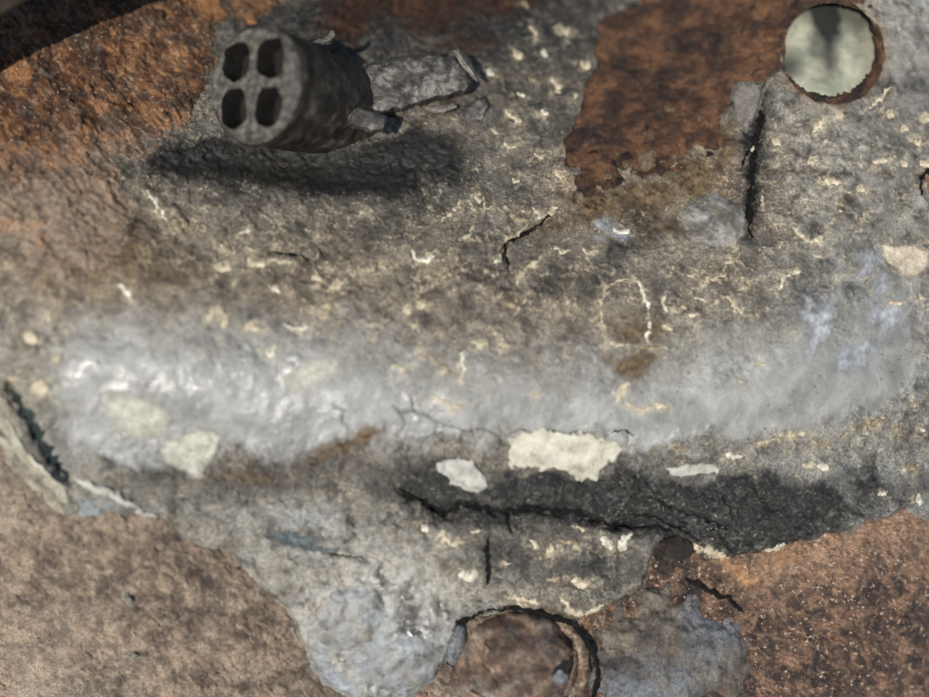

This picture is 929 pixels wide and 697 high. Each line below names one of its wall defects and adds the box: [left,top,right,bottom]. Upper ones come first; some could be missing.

crack [741,81,766,239]
crack [503,205,557,270]
water stain [803,298,834,350]
water stain [872,300,904,331]
water stain [838,341,876,370]
crack [10,388,69,478]
peeling [105,395,169,438]
peeling [436,455,488,493]
peeling [508,427,624,482]
peeling [665,463,719,477]
spalling [0,416,347,697]
spalling [413,494,929,697]